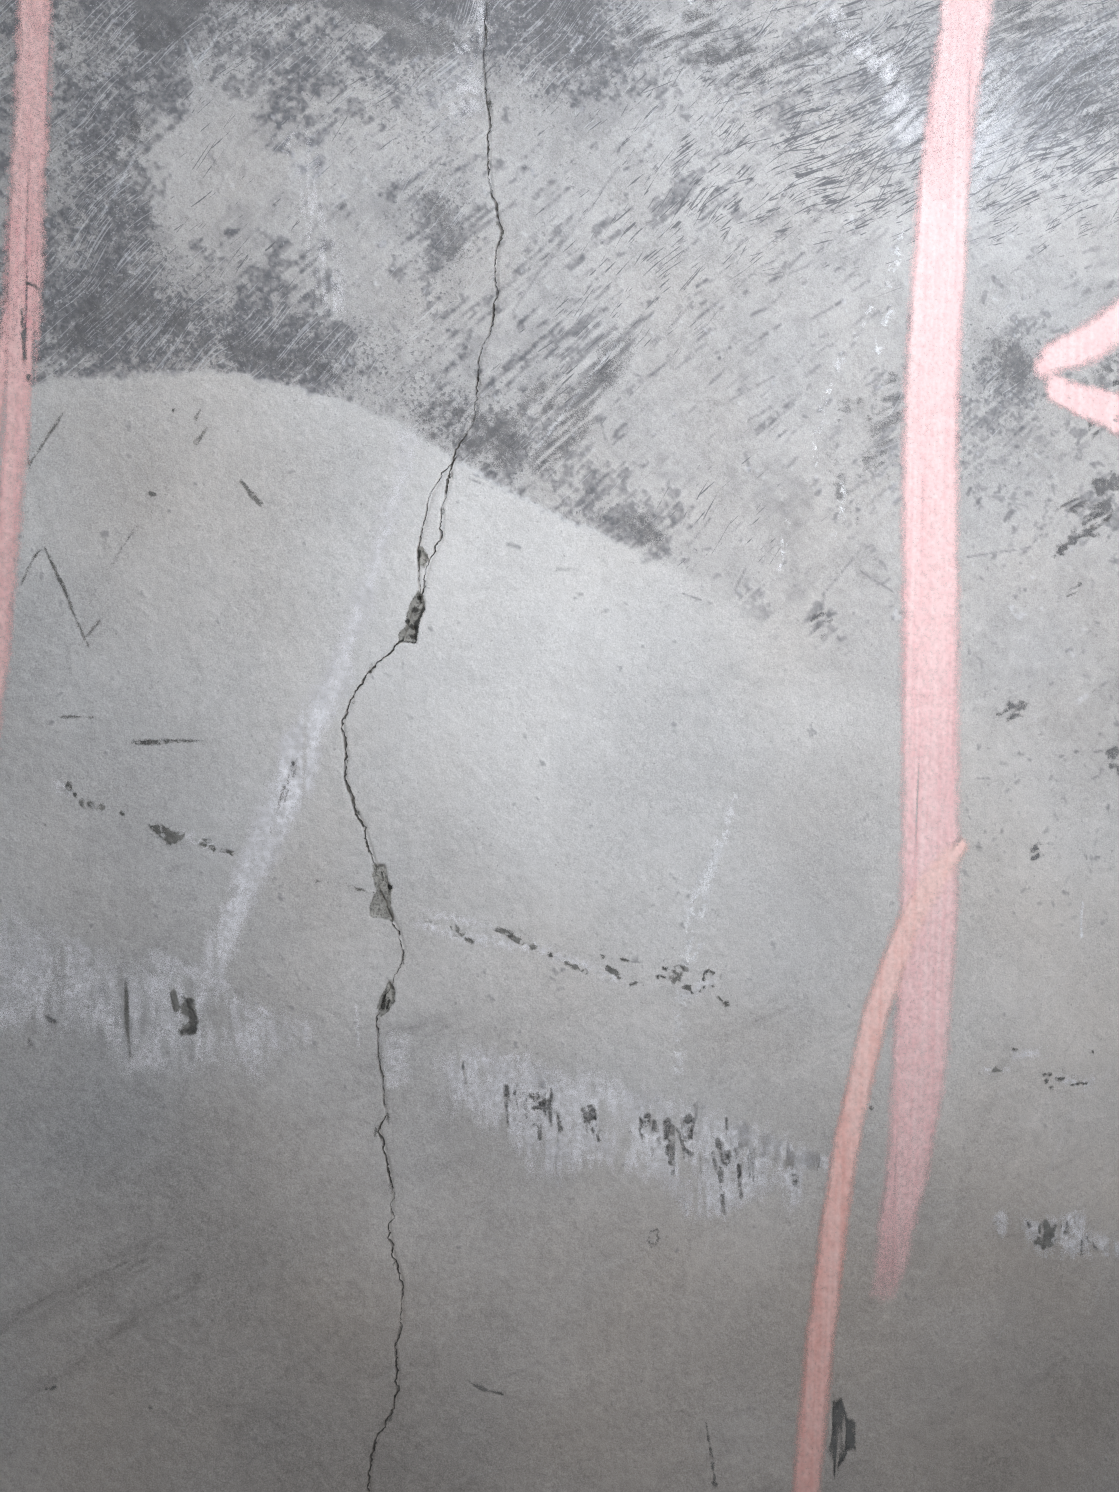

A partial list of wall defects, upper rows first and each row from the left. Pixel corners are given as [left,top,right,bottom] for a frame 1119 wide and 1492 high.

crack [341,4,504,1491]